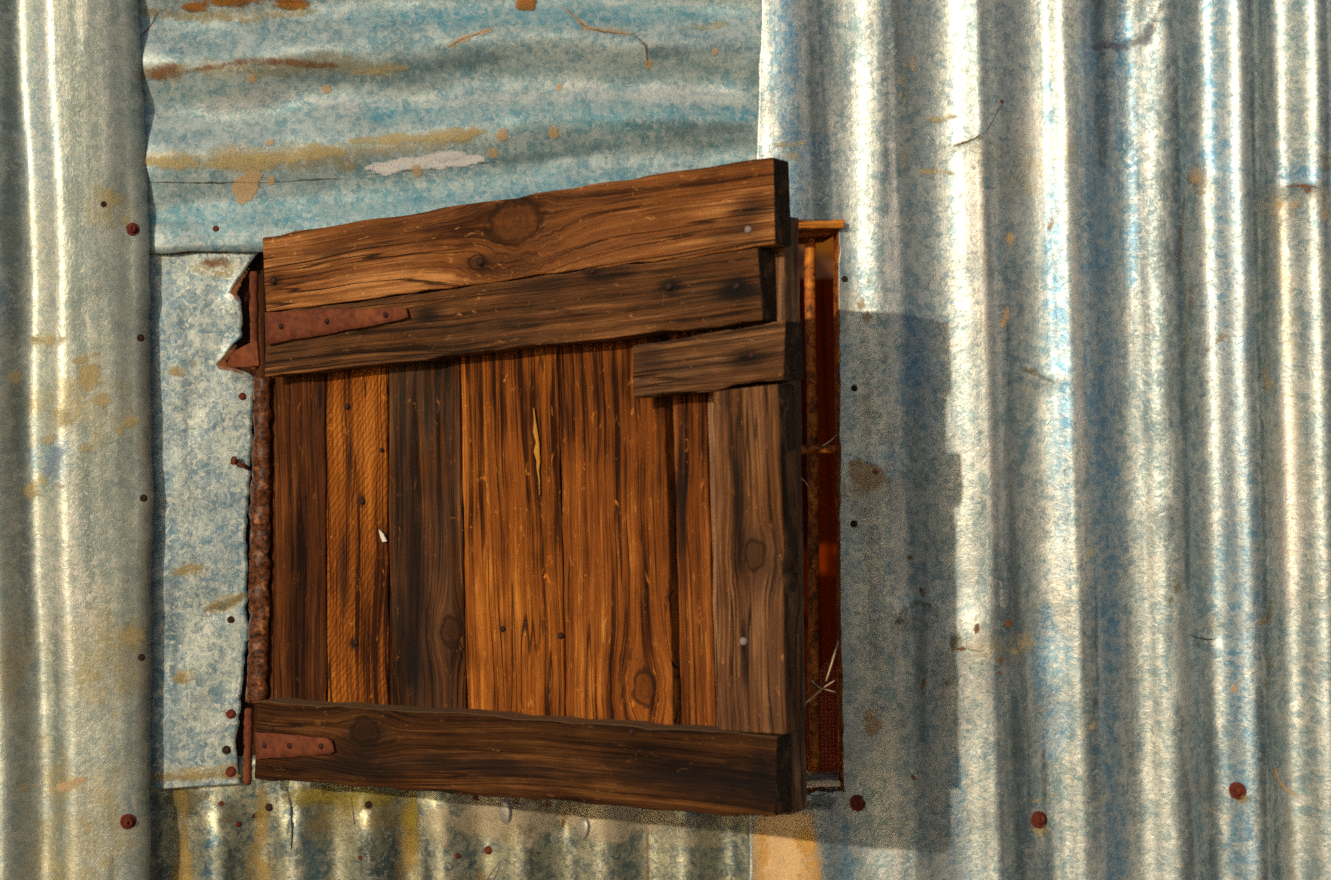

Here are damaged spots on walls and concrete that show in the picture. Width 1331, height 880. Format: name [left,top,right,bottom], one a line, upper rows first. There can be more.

corrosion [151,61,241,80]
corrosion [262,58,336,68]
corrosion [146,127,483,172]
corrosion [231,271,247,301]
corrosion [217,347,242,373]
leakage [284,783,418,856]
corrosion [751,812,820,880]